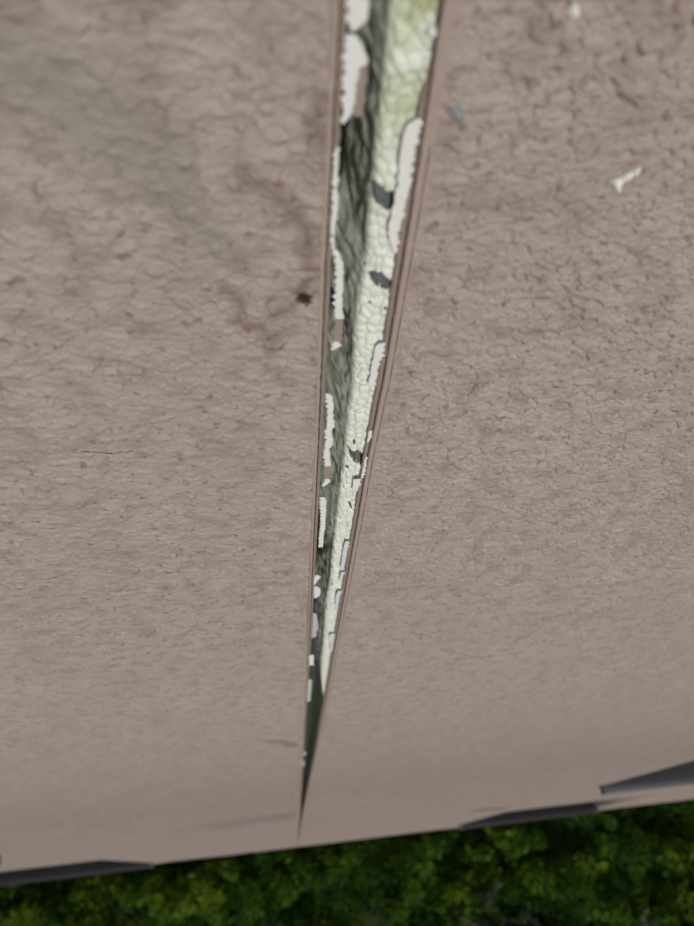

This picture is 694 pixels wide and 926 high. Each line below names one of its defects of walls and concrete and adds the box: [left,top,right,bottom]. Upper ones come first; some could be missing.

peeling [340,0,370,124]
peeling [388,119,423,253]
peeling [329,147,344,350]
peeling [368,343,385,387]
peeling [322,394,335,486]
peeling [352,457,368,491]
peeling [318,497,327,547]
peeling [313,575,321,598]
peeling [335,541,350,608]